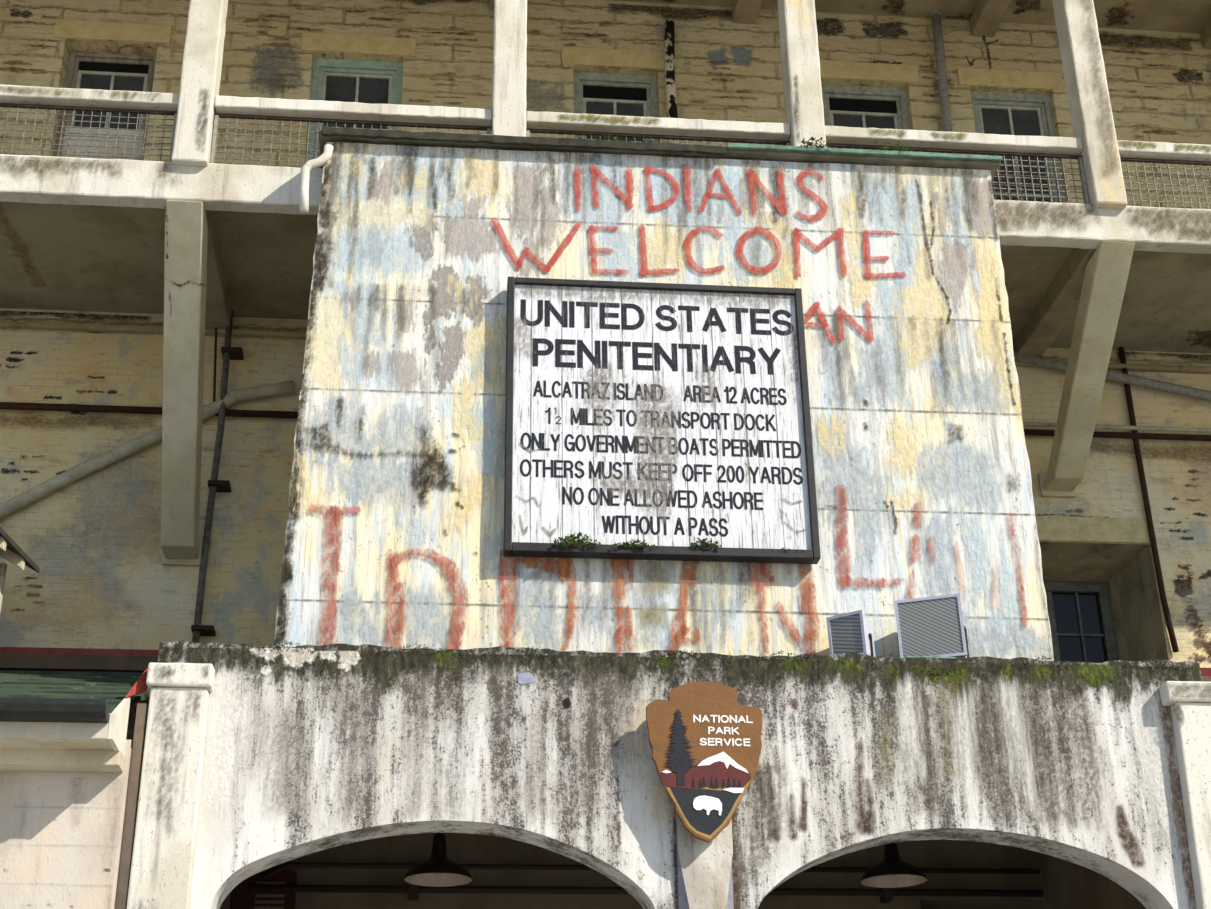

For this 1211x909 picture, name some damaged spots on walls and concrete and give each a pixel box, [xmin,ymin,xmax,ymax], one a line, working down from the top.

leakage [0,156,115,174]
crack [915,180,952,324]
leakage [1127,207,1211,239]
leakage [521,285,793,308]
peeling [0,351,38,368]
peeling [1,455,44,481]
leakage [156,142,681,730]
peeling [1160,469,1207,540]
leakage [723,614,1211,823]
leakage [156,692,174,817]
leakage [731,767,782,909]